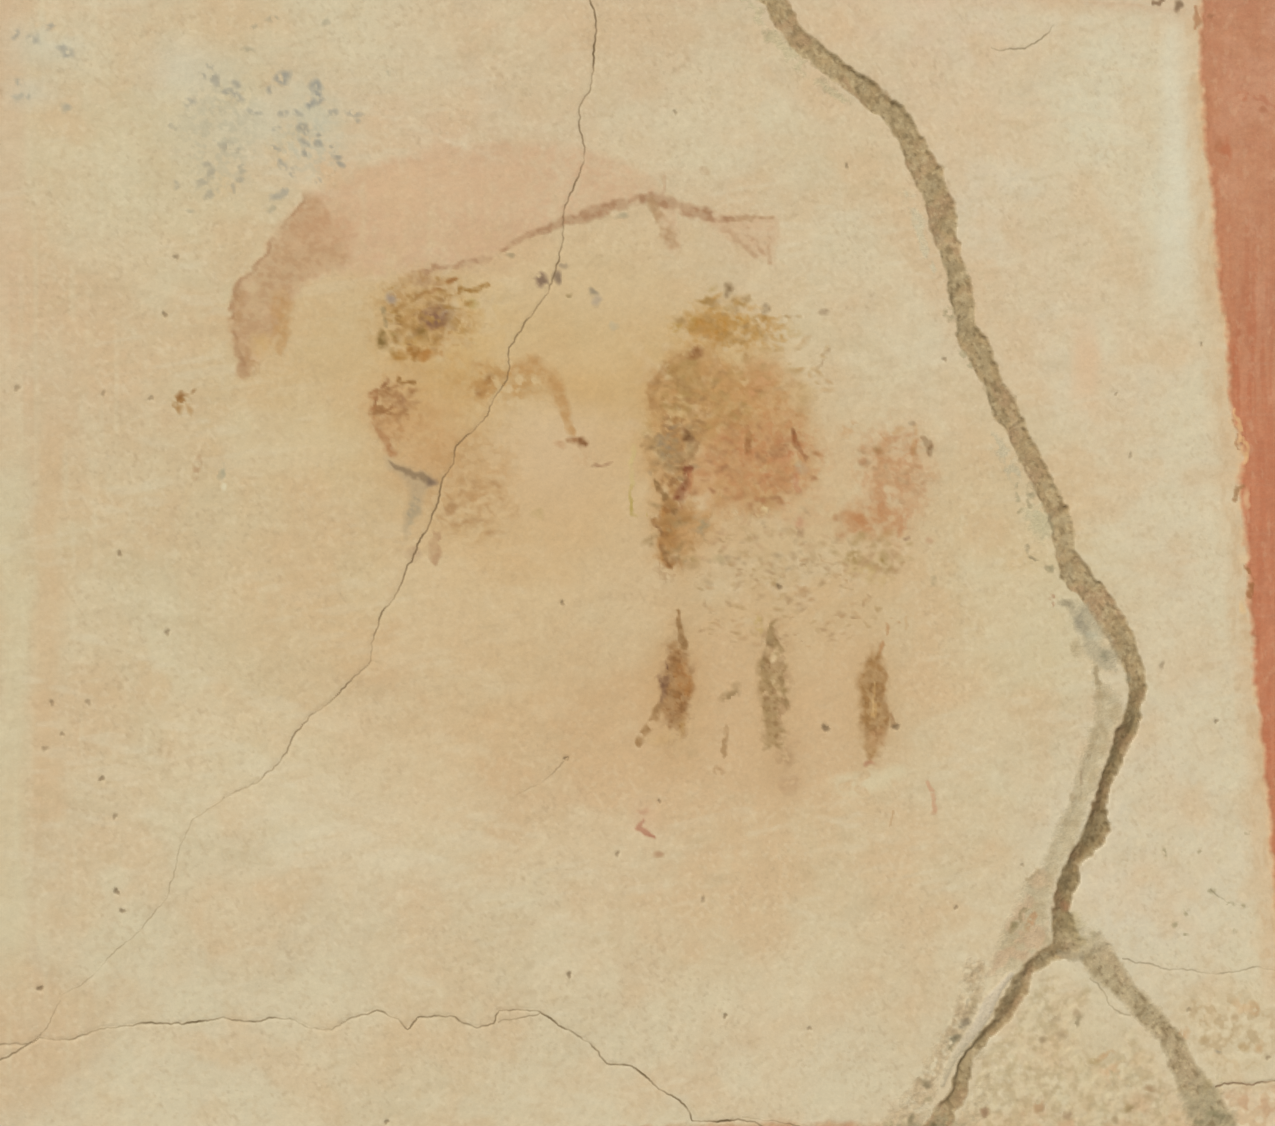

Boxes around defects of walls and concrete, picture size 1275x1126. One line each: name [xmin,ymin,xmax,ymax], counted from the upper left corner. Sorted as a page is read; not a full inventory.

crack [0,0,800,1126]
crack [738,0,1275,1126]